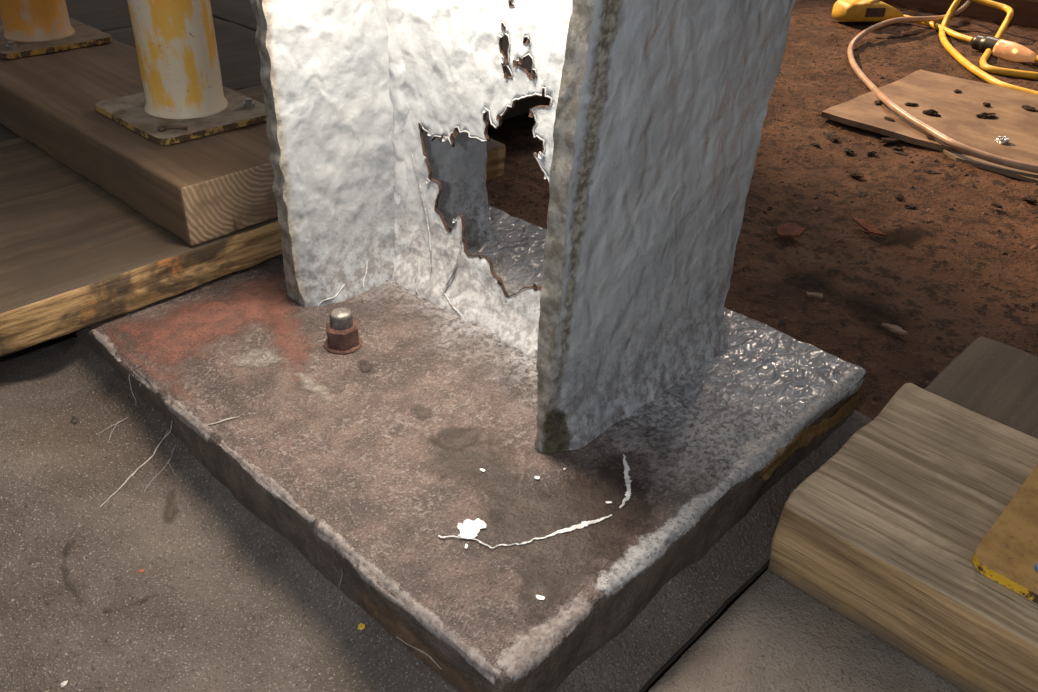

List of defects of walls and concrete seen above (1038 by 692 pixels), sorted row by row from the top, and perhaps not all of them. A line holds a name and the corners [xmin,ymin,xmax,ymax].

peeling [499,54,537,80]
peeling [418,123,458,142]
water stain [430,426,652,618]